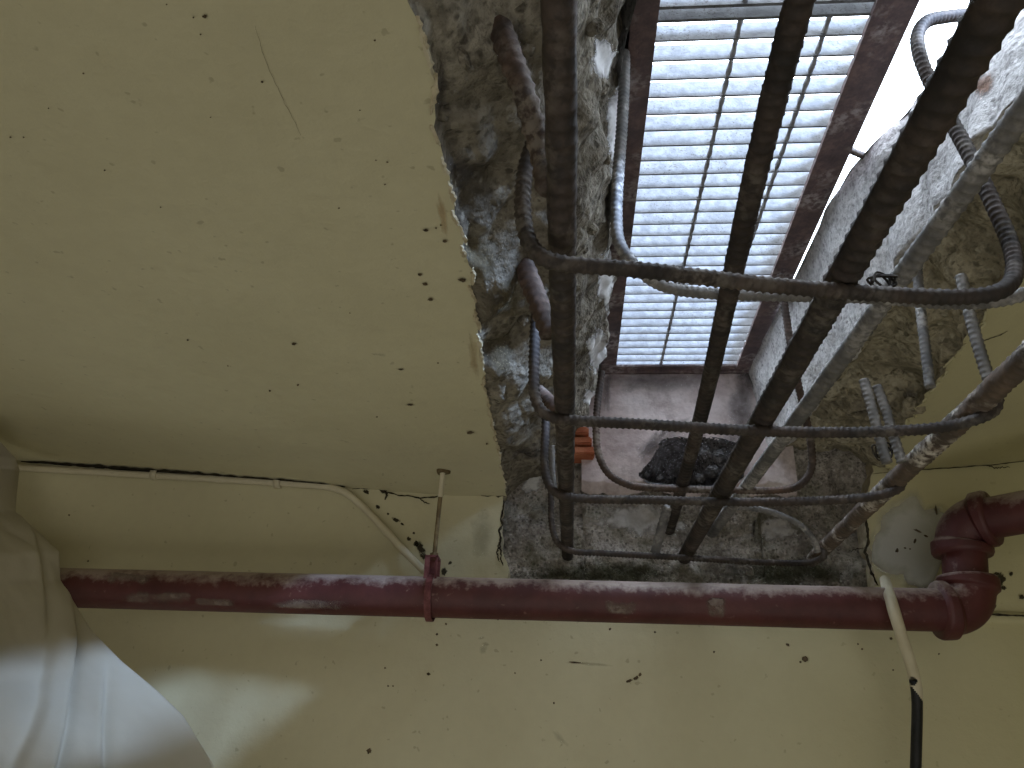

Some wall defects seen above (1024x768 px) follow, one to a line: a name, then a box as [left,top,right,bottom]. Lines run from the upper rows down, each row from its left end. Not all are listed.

crack [21,461,438,504]
spalling [407,0,1024,587]